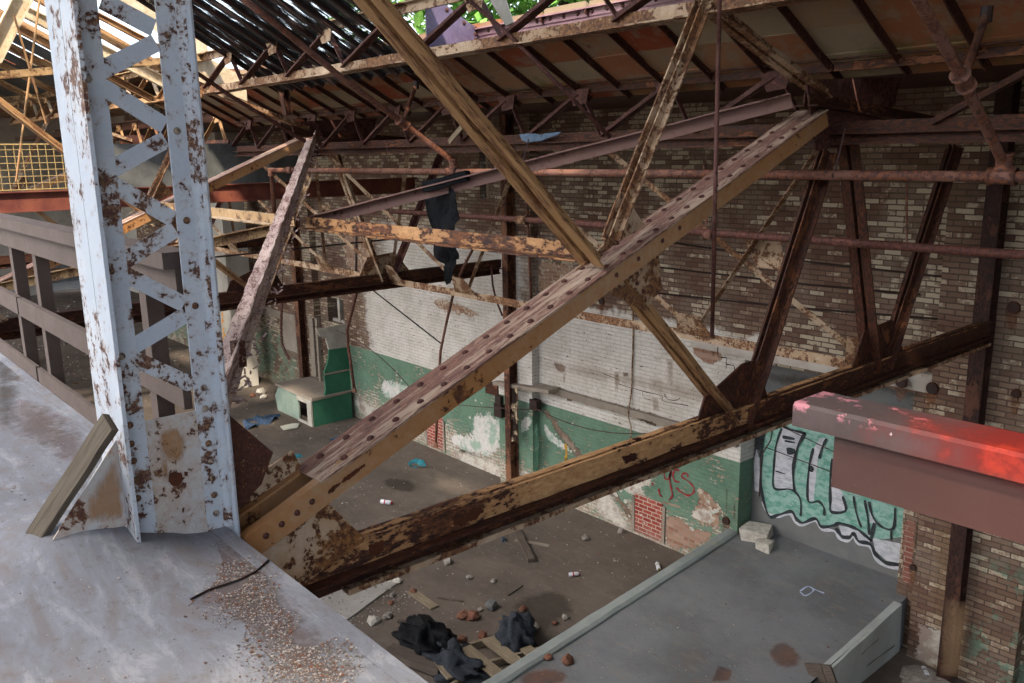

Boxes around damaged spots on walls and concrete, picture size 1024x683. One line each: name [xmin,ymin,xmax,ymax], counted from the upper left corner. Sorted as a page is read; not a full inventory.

peeling [451,386,575,477]
rust [91,469,121,518]
flaking render [663,487,730,549]